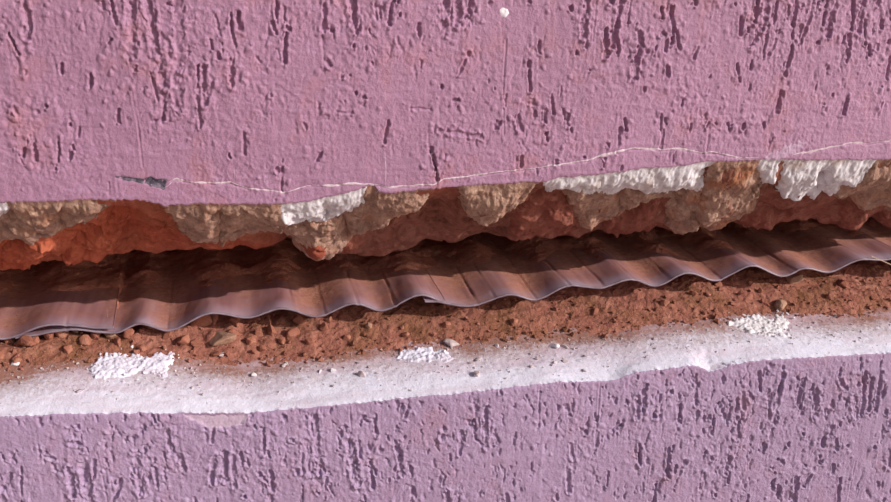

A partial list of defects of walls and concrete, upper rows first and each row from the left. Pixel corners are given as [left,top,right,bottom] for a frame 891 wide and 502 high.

spalling [115,176,167,190]
crack [164,147,759,193]
spalling [457,159,891,235]
crack [794,140,891,155]
spalling [0,199,117,246]
spalling [161,186,433,261]